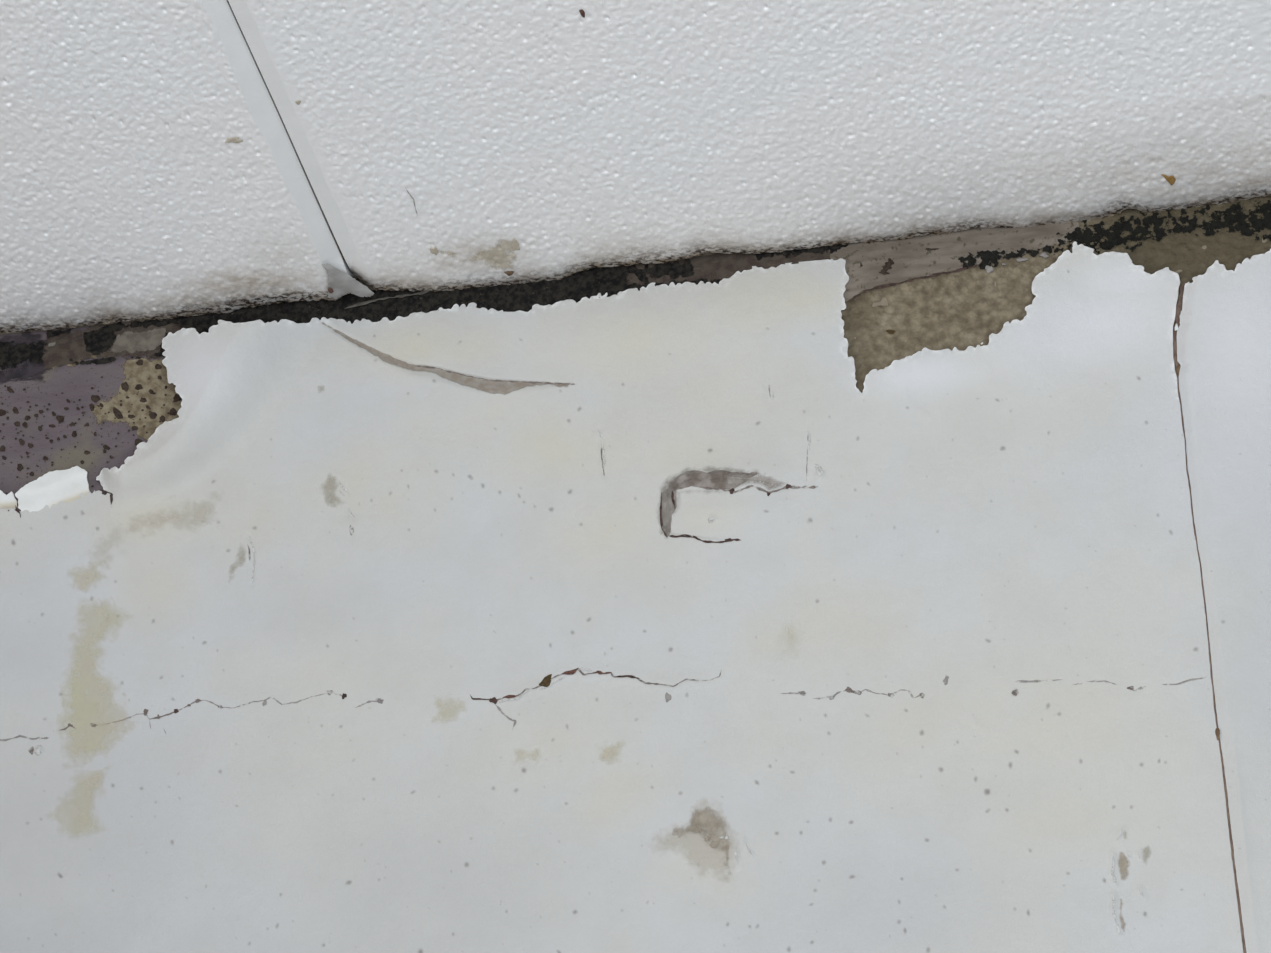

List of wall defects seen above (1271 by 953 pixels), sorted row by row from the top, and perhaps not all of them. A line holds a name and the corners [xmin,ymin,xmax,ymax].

peeling [829,196,1271,393]
peeling [0,311,337,531]
crack [0,690,384,756]
crack [470,668,721,727]